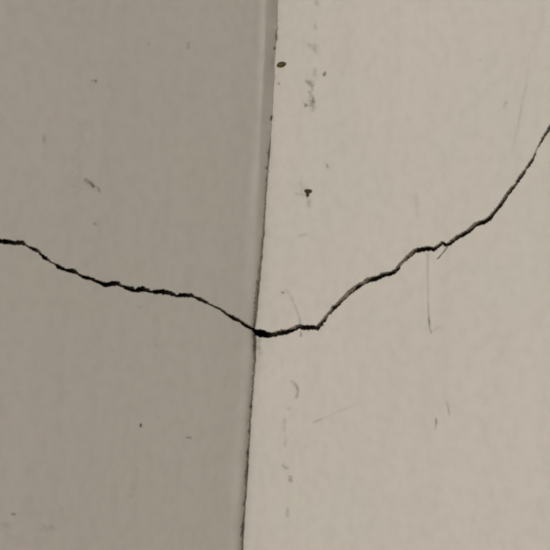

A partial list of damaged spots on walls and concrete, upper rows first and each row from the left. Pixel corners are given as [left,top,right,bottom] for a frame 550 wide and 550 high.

crack [0,115,550,550]